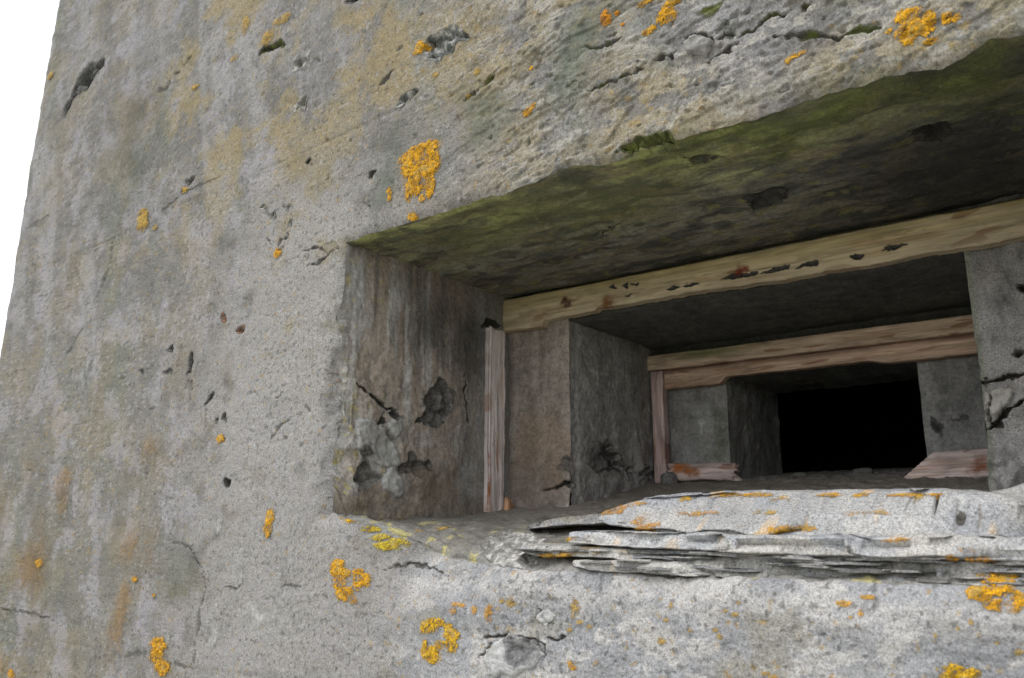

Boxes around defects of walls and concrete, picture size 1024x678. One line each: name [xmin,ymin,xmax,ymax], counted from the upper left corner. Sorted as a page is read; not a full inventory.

spalling [422,25,469,63]
crack [567,3,882,92]
spalling [63,56,104,114]
spalling [395,88,418,107]
crack [356,383,422,425]
spalling [417,376,455,428]
flaking render [353,416,433,492]
spalling [594,439,654,480]
flaking render [536,609,555,629]
flaking render [483,635,546,678]